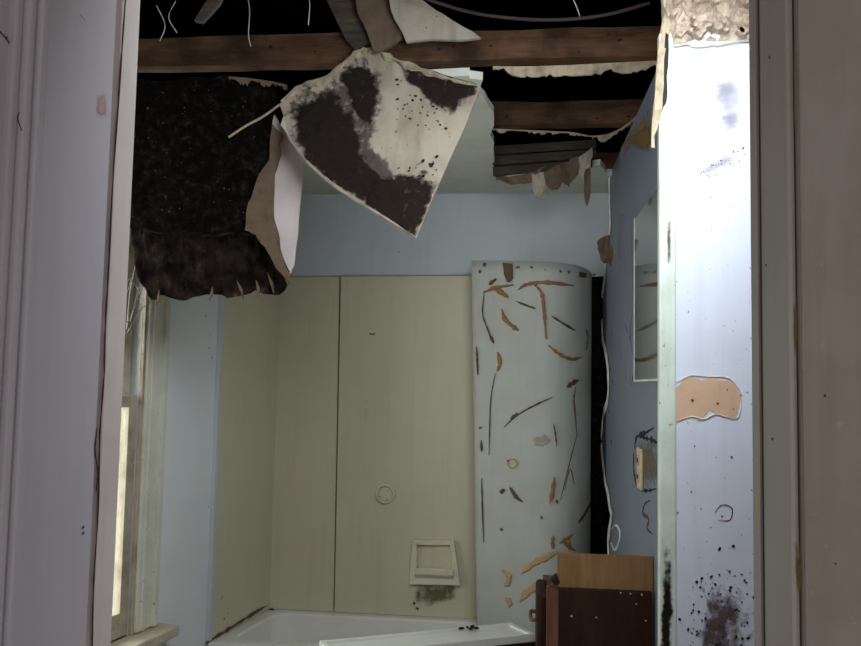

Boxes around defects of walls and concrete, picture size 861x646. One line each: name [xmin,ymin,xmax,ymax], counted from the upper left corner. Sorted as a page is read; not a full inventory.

flaking render [661,0,749,48]
leakage [396,62,477,130]
leakage [285,58,439,235]
peeling [676,375,742,422]
leakage [661,553,754,646]